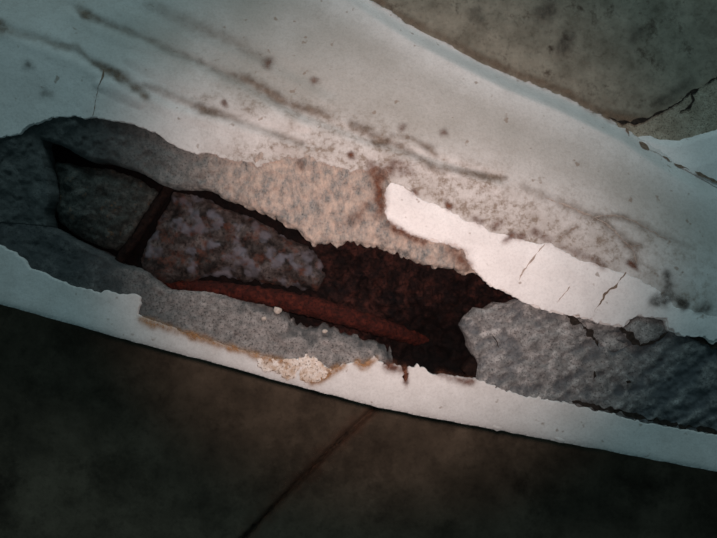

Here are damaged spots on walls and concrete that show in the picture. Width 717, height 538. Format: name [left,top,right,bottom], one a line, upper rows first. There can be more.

spalling [0,116,717,434]